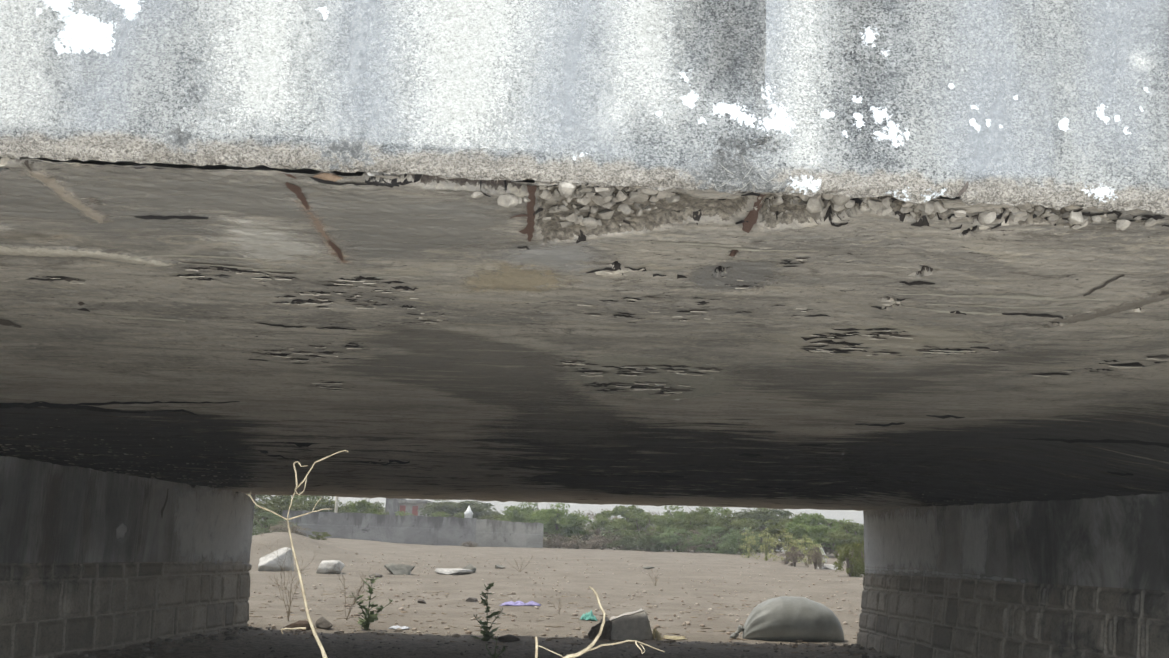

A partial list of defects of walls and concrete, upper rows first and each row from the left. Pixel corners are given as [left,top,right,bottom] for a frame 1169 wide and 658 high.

peeling [35,0,144,56]
peeling [679,69,798,139]
peeling [840,96,910,153]
crack [24,160,253,172]
spalling [365,174,1157,250]
damp [324,327,632,444]
damp [728,350,1080,405]